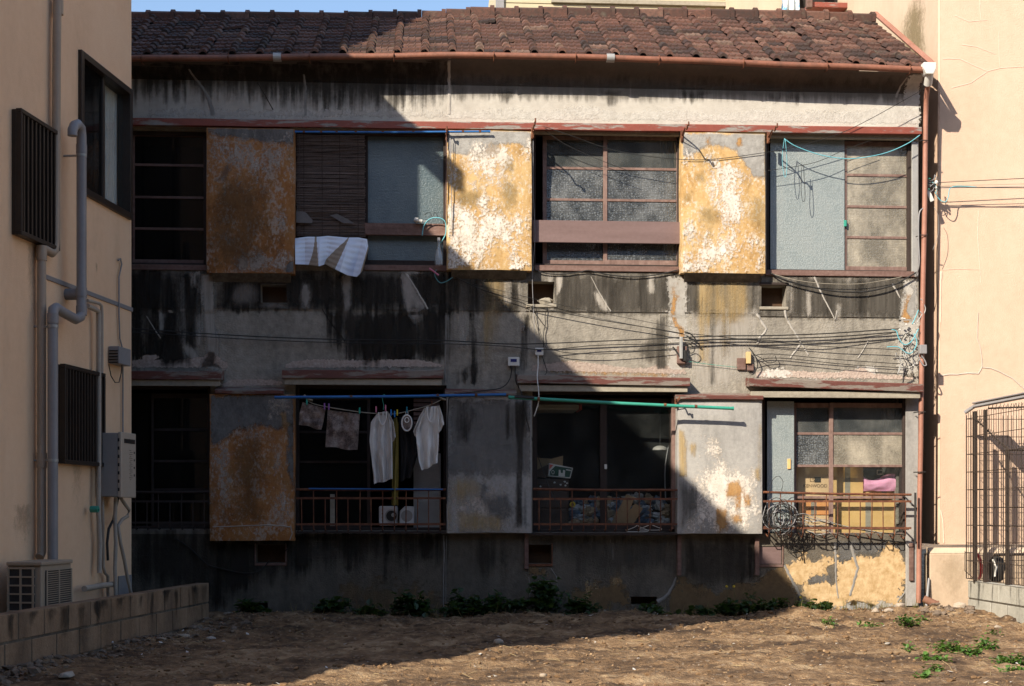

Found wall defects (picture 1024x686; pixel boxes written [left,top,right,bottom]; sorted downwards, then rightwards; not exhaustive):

damp [131,46,914,177]
peeling [448,138,531,269]
peeling [666,151,764,377]
damp [131,270,756,482]
damp [448,397,531,525]
peeling [686,436,761,533]
peeling [667,542,905,614]